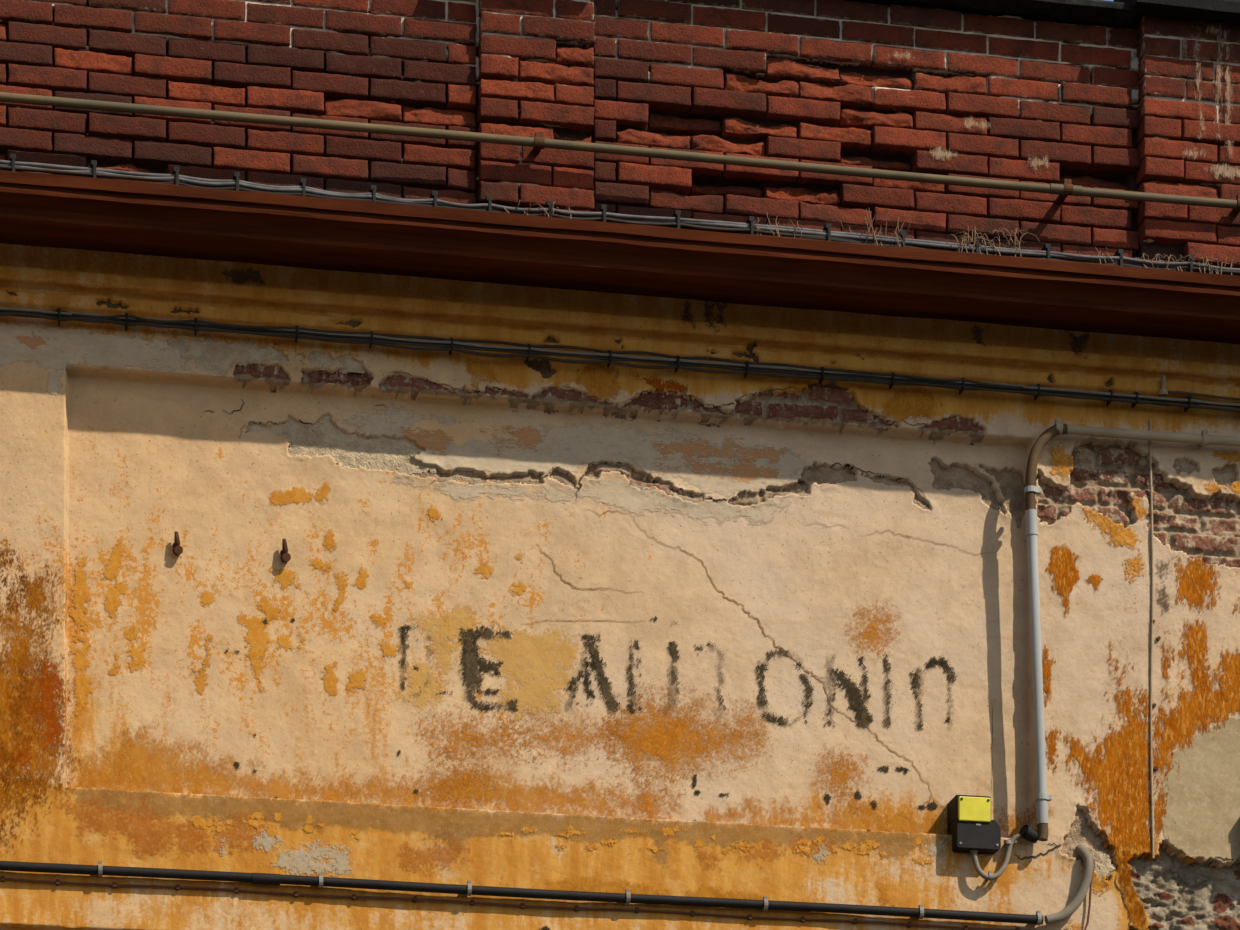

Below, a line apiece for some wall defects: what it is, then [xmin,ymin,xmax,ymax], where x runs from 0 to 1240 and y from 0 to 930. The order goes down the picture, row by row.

damp [930,147,956,160]
damp [1181,25,1240,179]
peeling [232,351,931,526]
peeling [67,542,150,716]
peeling [185,566,307,695]
peeling [309,528,369,613]
crack [527,462,947,813]
crack [807,522,996,555]
spalling [930,442,1240,568]
damp [1156,559,1170,614]
damp [60,788,952,872]
spalling [1061,809,1240,930]